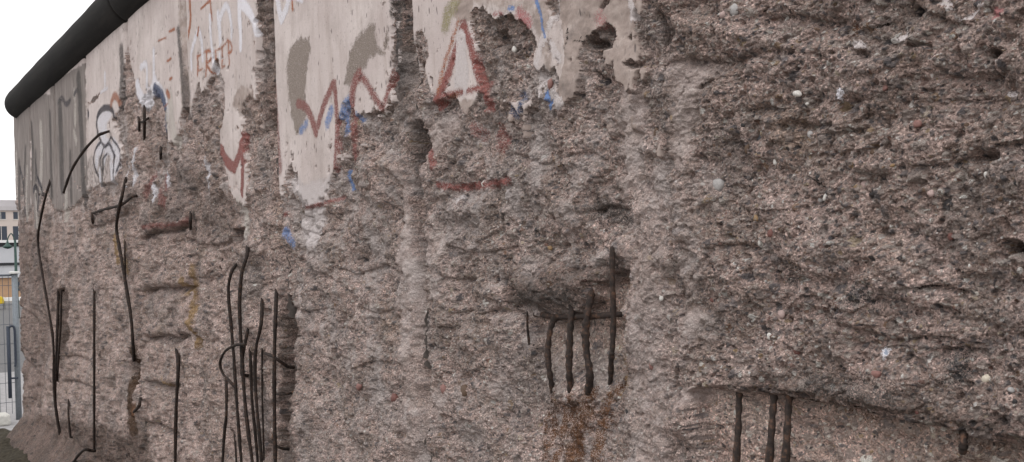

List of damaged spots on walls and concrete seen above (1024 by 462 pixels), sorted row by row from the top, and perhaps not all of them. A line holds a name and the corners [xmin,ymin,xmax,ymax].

spalling [6,47,205,462]
spalling [190,0,434,462]
corrosion [539,356,629,462]
spalling [415,0,1024,462]